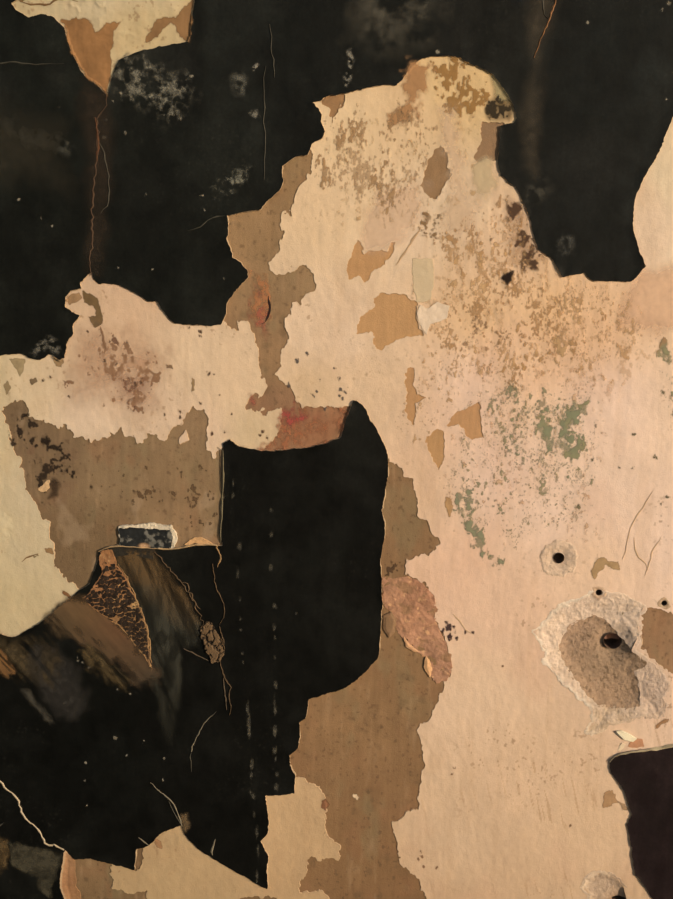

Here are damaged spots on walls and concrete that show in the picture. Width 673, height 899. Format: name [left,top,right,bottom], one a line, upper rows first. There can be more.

peeling [12,0,195,96]
peeling [104,547,156,559]
peeling [118,522,178,549]
peeling [184,537,213,545]
peeling [628,738,644,748]
peeling [602,790,618,808]
crack [0,781,64,851]
peeling [262,777,341,899]
peeling [60,826,282,899]